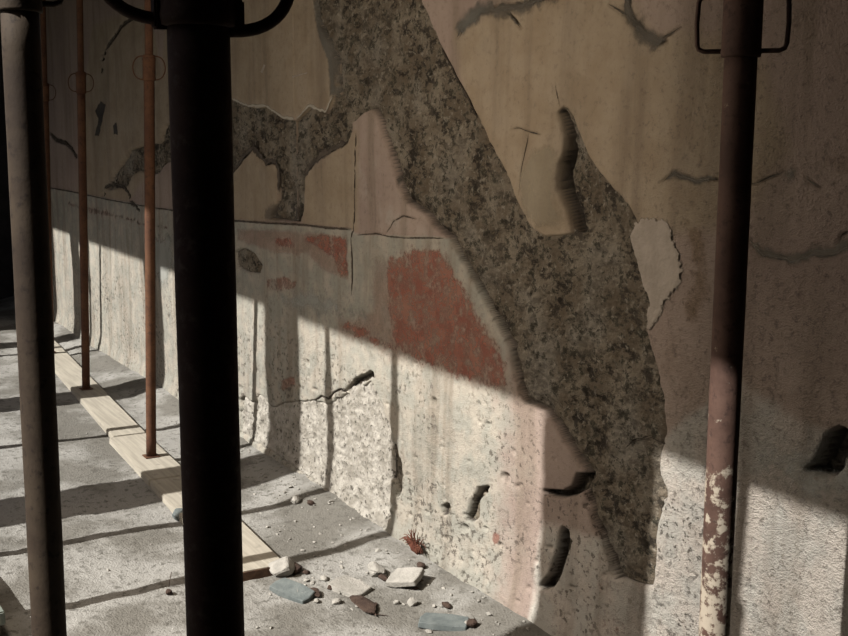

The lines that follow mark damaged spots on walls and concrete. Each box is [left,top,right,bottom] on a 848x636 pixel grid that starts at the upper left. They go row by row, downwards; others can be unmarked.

crack [609,0,679,50]
crack [442,0,544,118]
flaking render [111,147,144,189]
crack [666,170,717,184]
crack [752,232,848,263]
flaking render [232,0,668,585]
crack [315,389,346,401]
spalling [827,431,848,471]